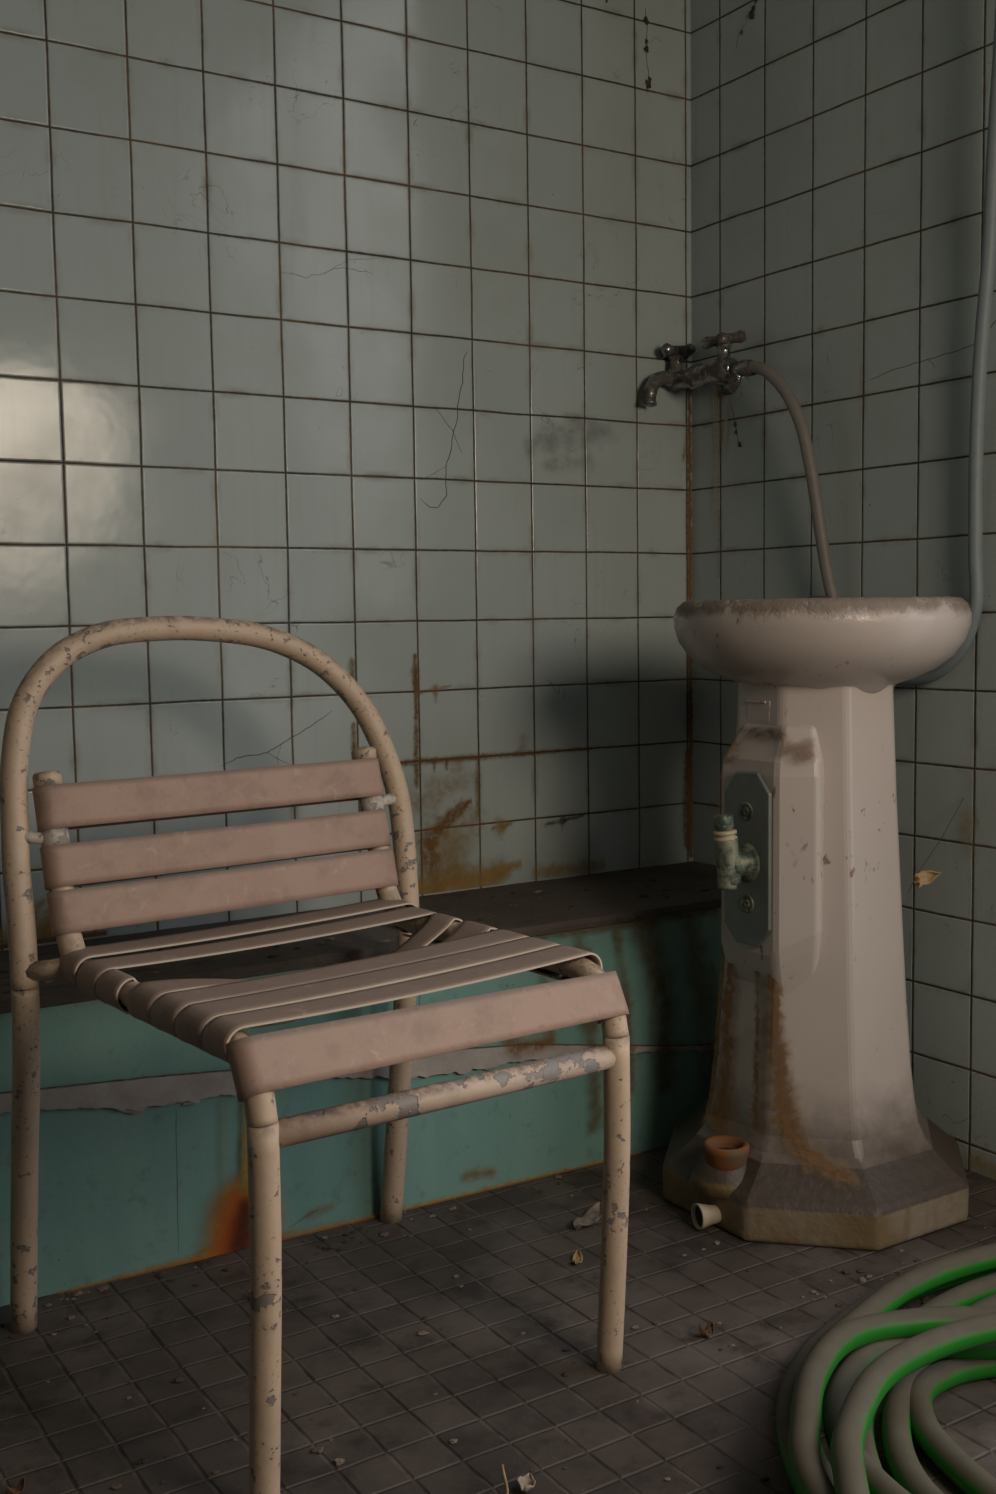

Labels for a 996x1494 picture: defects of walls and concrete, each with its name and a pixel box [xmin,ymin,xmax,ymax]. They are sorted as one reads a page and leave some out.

corrosion [401,654,591,785]
corrosion [683,655,693,857]
corrosion [420,782,479,892]
peeling [40,1069,237,1114]
peeling [338,1066,389,1079]
peeling [411,1044,603,1079]
corrosion [705,943,855,1184]
corrosion [62,1106,250,1292]
corrosion [403,1161,603,1211]